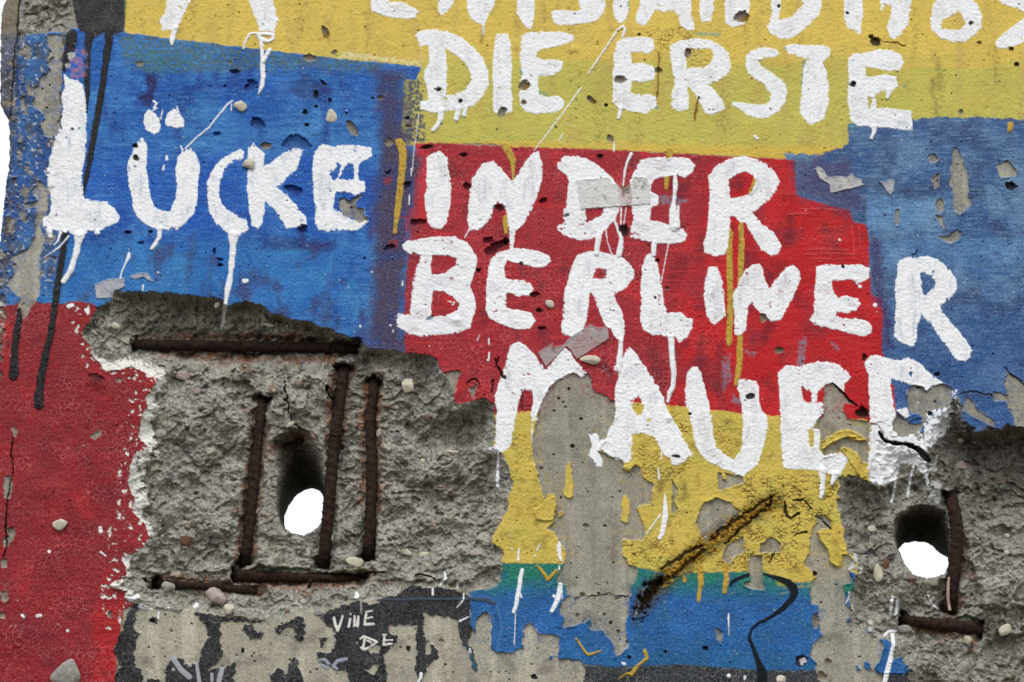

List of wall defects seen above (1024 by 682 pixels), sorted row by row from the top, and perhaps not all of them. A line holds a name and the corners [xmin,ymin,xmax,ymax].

peeling [19,0,74,138]
peeling [928,147,972,243]
peeling [996,161,1018,192]
peeling [7,181,57,318]
rust [142,330,386,565]
rust [156,568,378,600]
spalling [71,291,654,682]
peeling [696,473,744,541]
peeling [722,538,781,591]
crack [878,432,932,463]
spalling [796,373,1024,682]
rust [902,594,989,657]